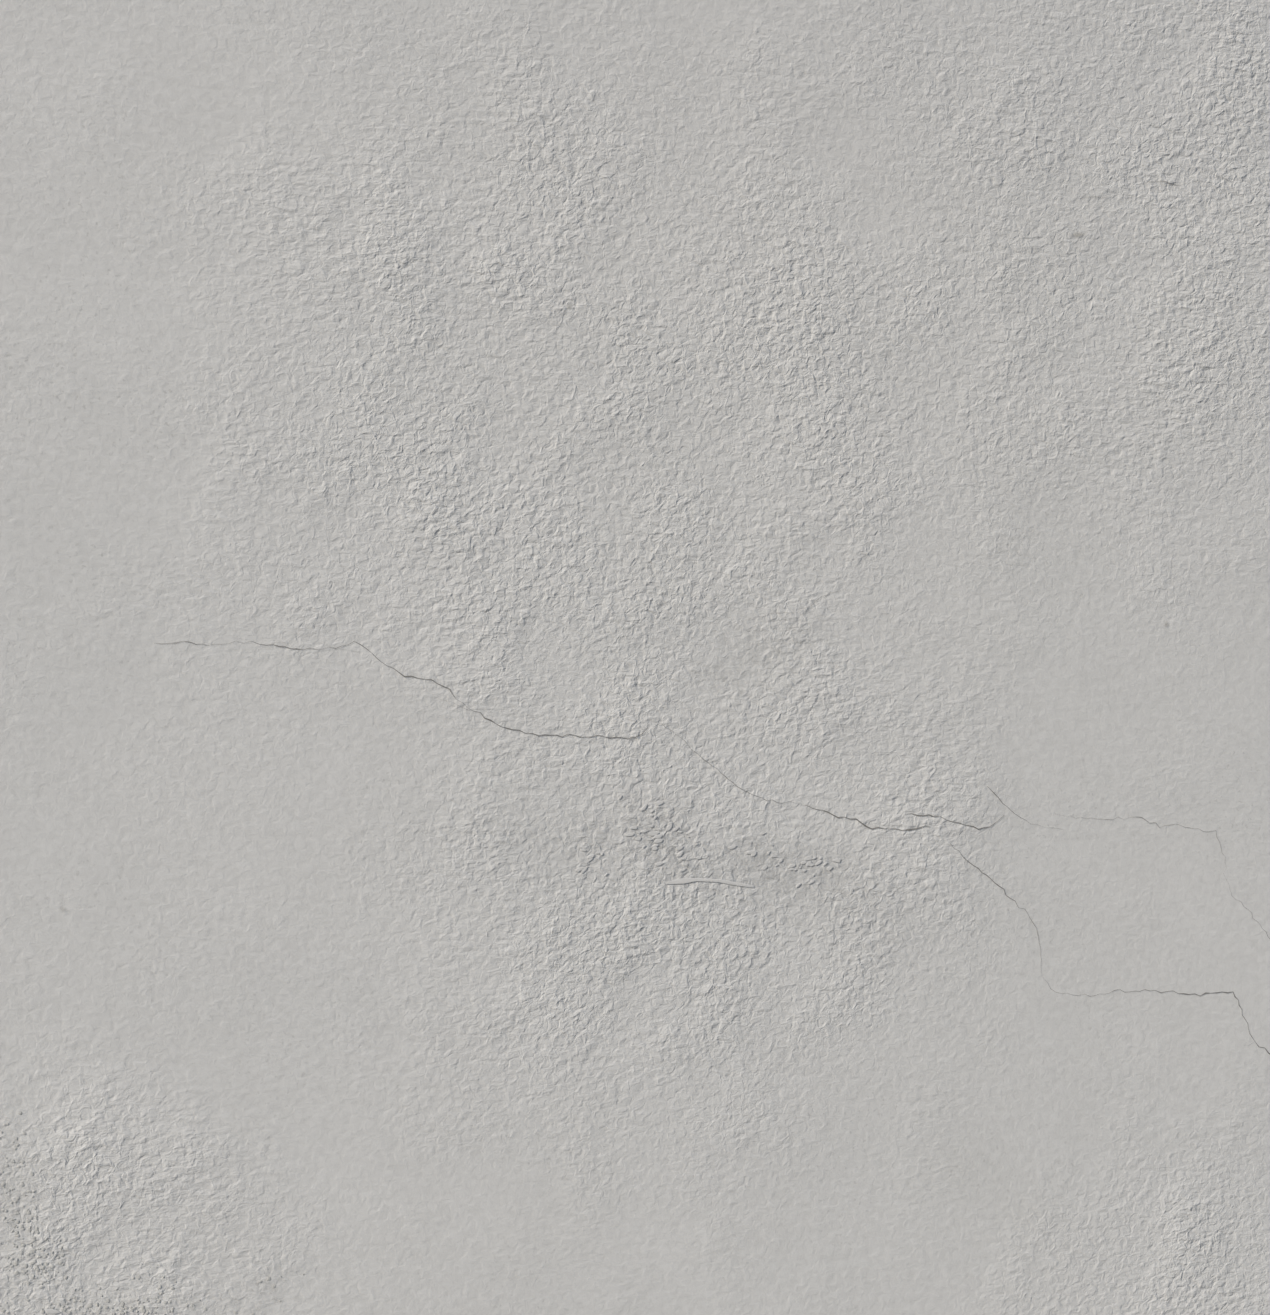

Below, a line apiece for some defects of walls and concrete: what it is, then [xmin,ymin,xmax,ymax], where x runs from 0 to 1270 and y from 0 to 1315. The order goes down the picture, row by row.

crack [156,641,1270,1054]